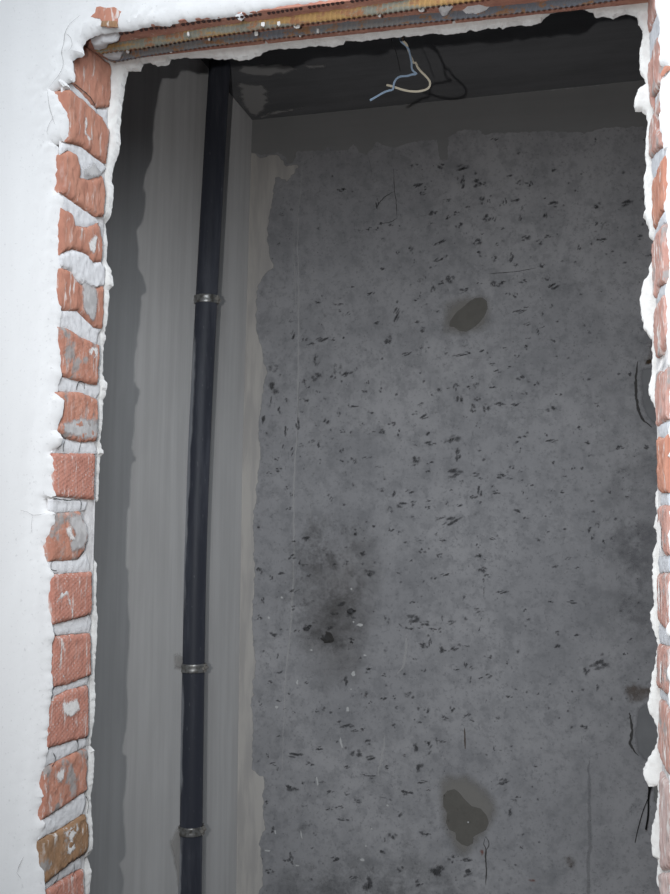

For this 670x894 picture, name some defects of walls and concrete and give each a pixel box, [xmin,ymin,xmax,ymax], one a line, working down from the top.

crack [634,361,651,427]
crack [629,713,639,756]